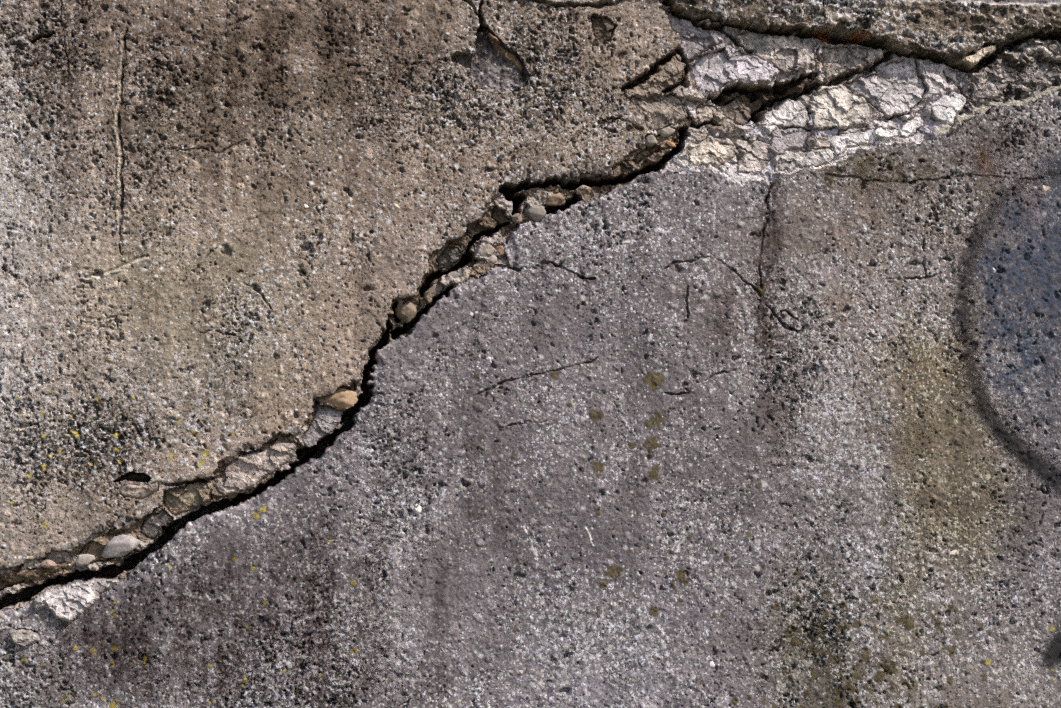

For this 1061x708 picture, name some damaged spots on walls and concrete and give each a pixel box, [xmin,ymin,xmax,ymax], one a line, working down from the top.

crack [58,0,75,79]
crack [462,0,479,19]
crack [514,0,629,9]
crack [820,0,828,23]
spalling [597,0,1061,187]
crack [111,26,135,254]
crack [809,172,1044,185]
crack [661,183,828,334]
crack [876,221,942,283]
crack [0,88,691,648]
crack [663,368,737,396]